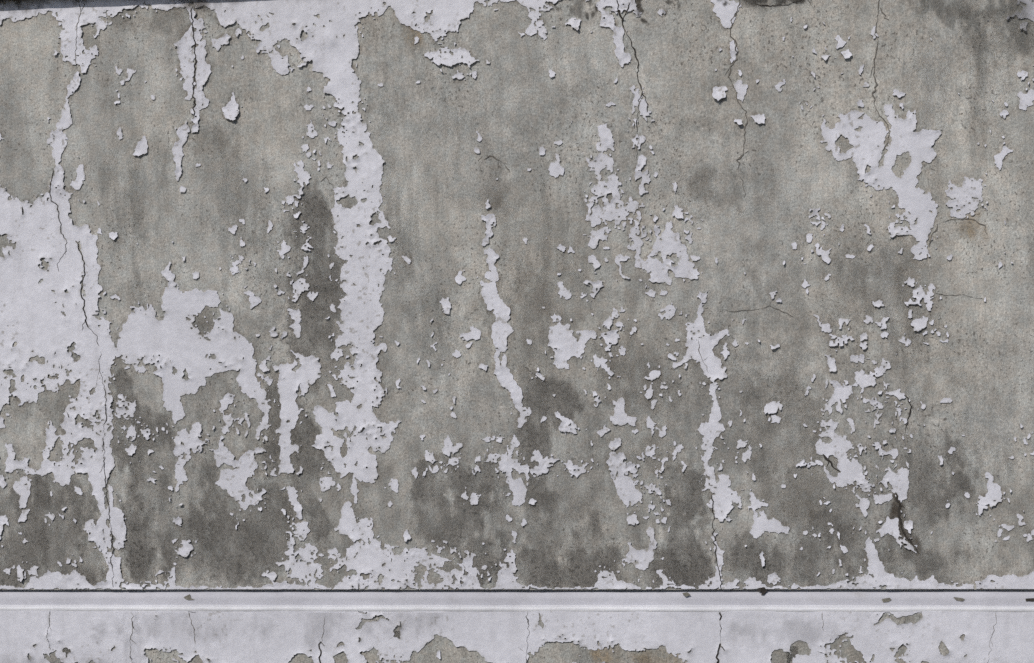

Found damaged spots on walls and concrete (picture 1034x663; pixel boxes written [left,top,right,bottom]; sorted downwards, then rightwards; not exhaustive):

peeling [555,85,703,301]
crack [617,1,648,159]
crack [724,0,813,198]
peeling [820,79,1013,260]
crack [49,173,114,585]
peeling [545,306,637,390]
peeling [658,290,790,554]
peeling [794,314,913,517]
crack [709,494,722,587]
crack [896,494,919,553]
peeling [528,636,691,663]
crack [716,613,724,663]